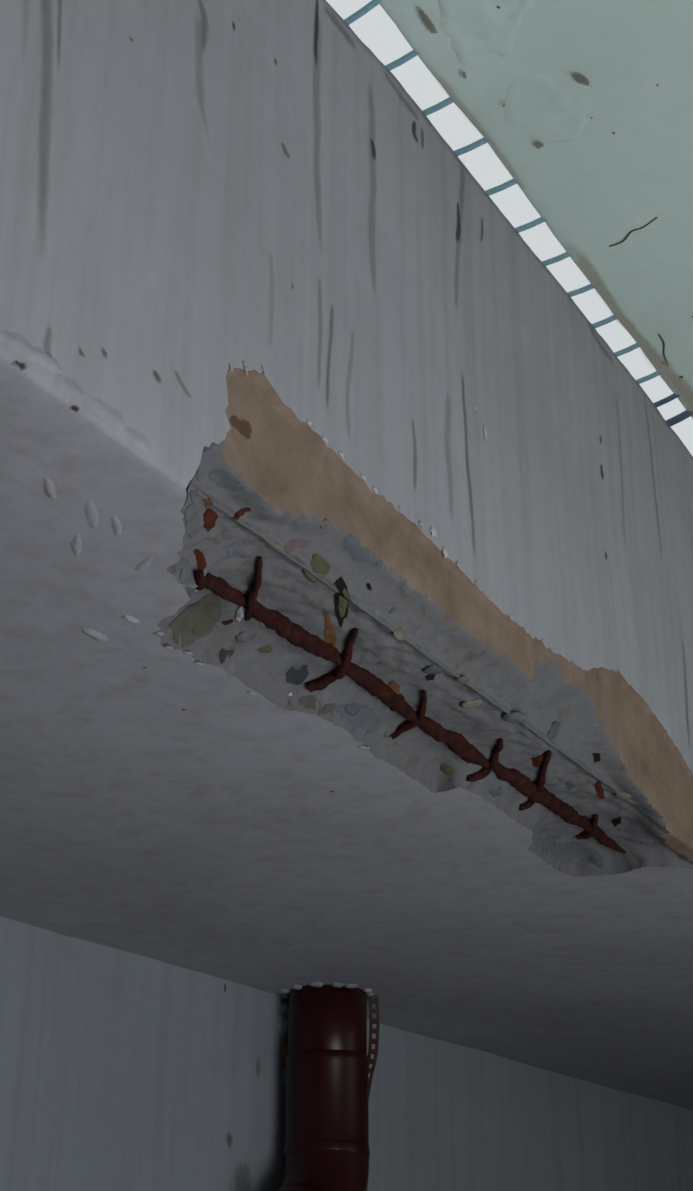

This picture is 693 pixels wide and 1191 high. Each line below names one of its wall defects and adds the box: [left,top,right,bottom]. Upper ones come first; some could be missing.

crack [609,217,658,247]
corrosion [195,549,207,570]
spalling [154,360,693,877]
corrosion [595,782,605,799]